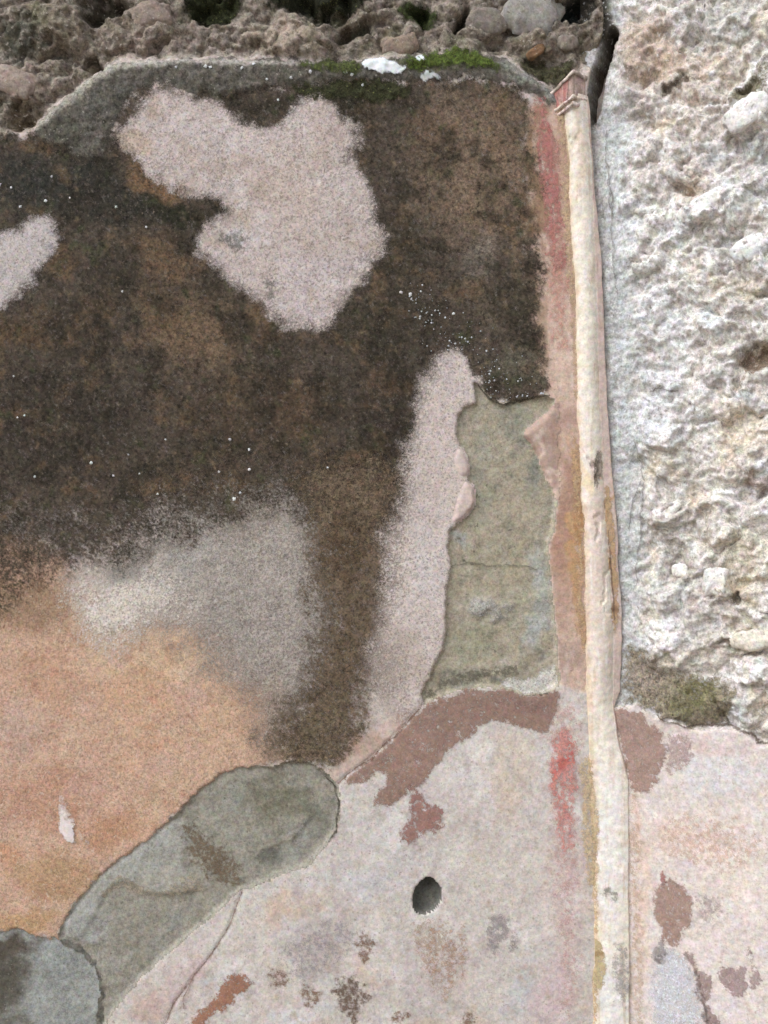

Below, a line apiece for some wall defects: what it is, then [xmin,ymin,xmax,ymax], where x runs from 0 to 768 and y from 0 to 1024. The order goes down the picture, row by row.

water stain [0,75,558,771]
flaking render [421,382,561,705]
flaking render [0,760,340,1024]
crack [165,892,242,1023]